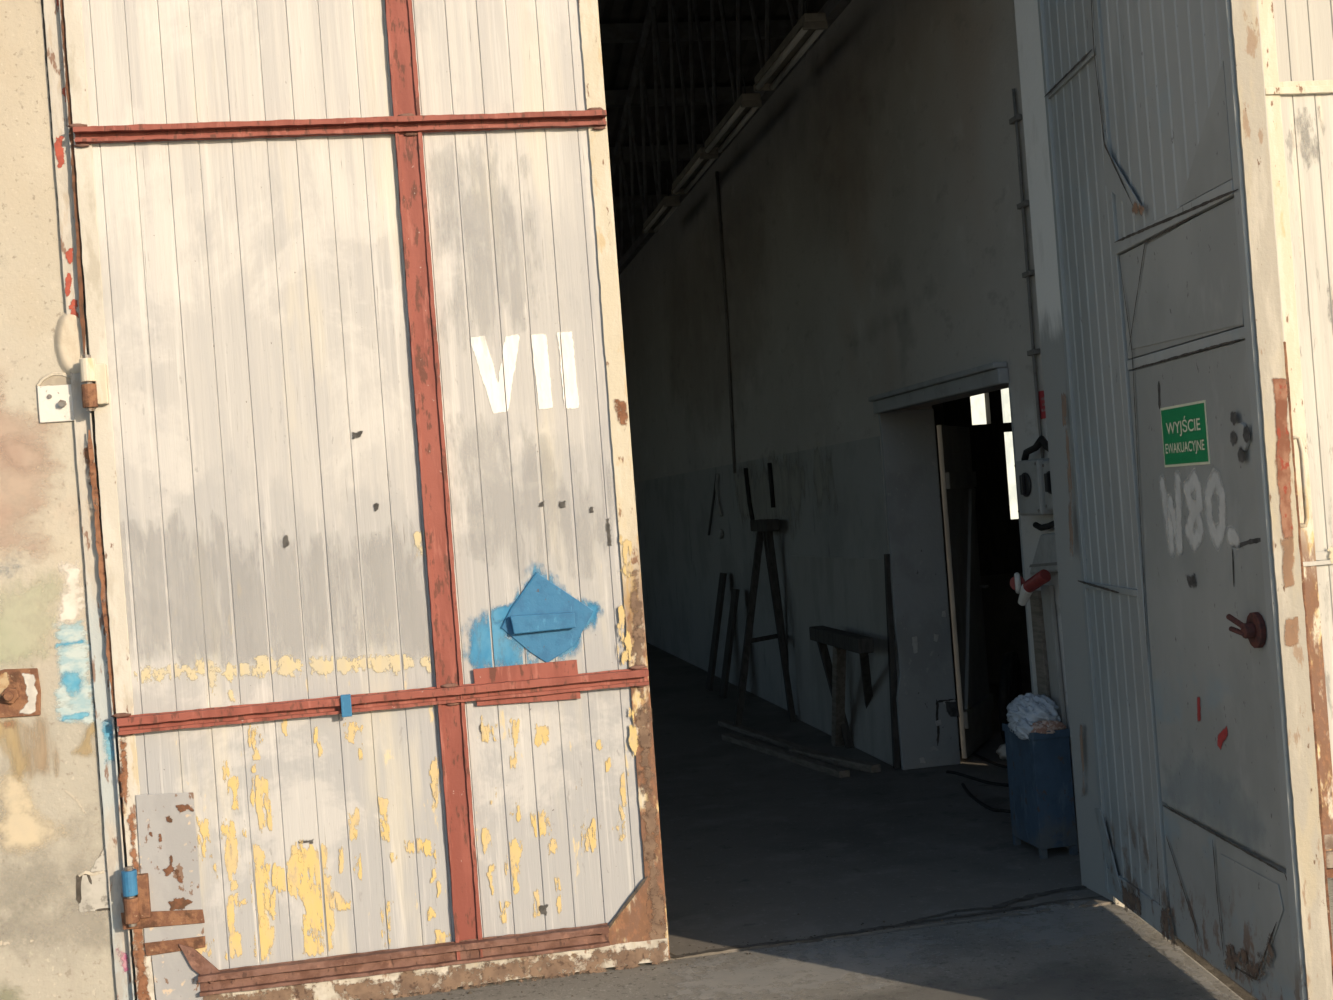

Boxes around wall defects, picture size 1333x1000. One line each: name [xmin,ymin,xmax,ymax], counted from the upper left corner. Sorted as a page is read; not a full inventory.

corrosion [60,0,86,355]
corrosion [1273,378,1294,588]
corrosion [84,430,116,718]
peeling [134,654,435,701]
corrosion [1285,617,1299,647]
peeling [196,722,363,961]
peeling [378,797,451,945]
peeling [429,757,440,808]
corrosion [333,687,670,1000]
peeling [482,805,562,923]
peeling [596,708,638,841]
corrosion [203,984,315,1000]